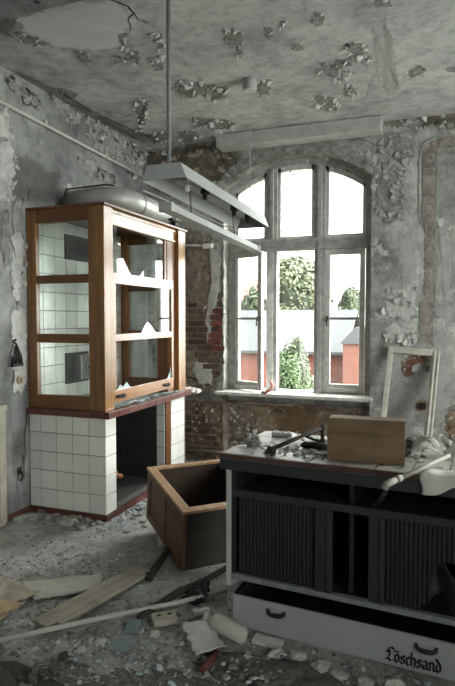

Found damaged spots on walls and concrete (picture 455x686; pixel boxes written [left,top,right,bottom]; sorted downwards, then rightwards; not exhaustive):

flaking render [11,0,166,72]
crack [111,0,147,45]
peeling [171,79,231,104]
peeling [224,27,245,59]
peeling [310,42,374,113]
spalling [0,106,20,205]
spalling [50,88,455,226]
peeling [9,230,29,309]
flaking render [185,224,365,462]
peeling [381,283,430,377]